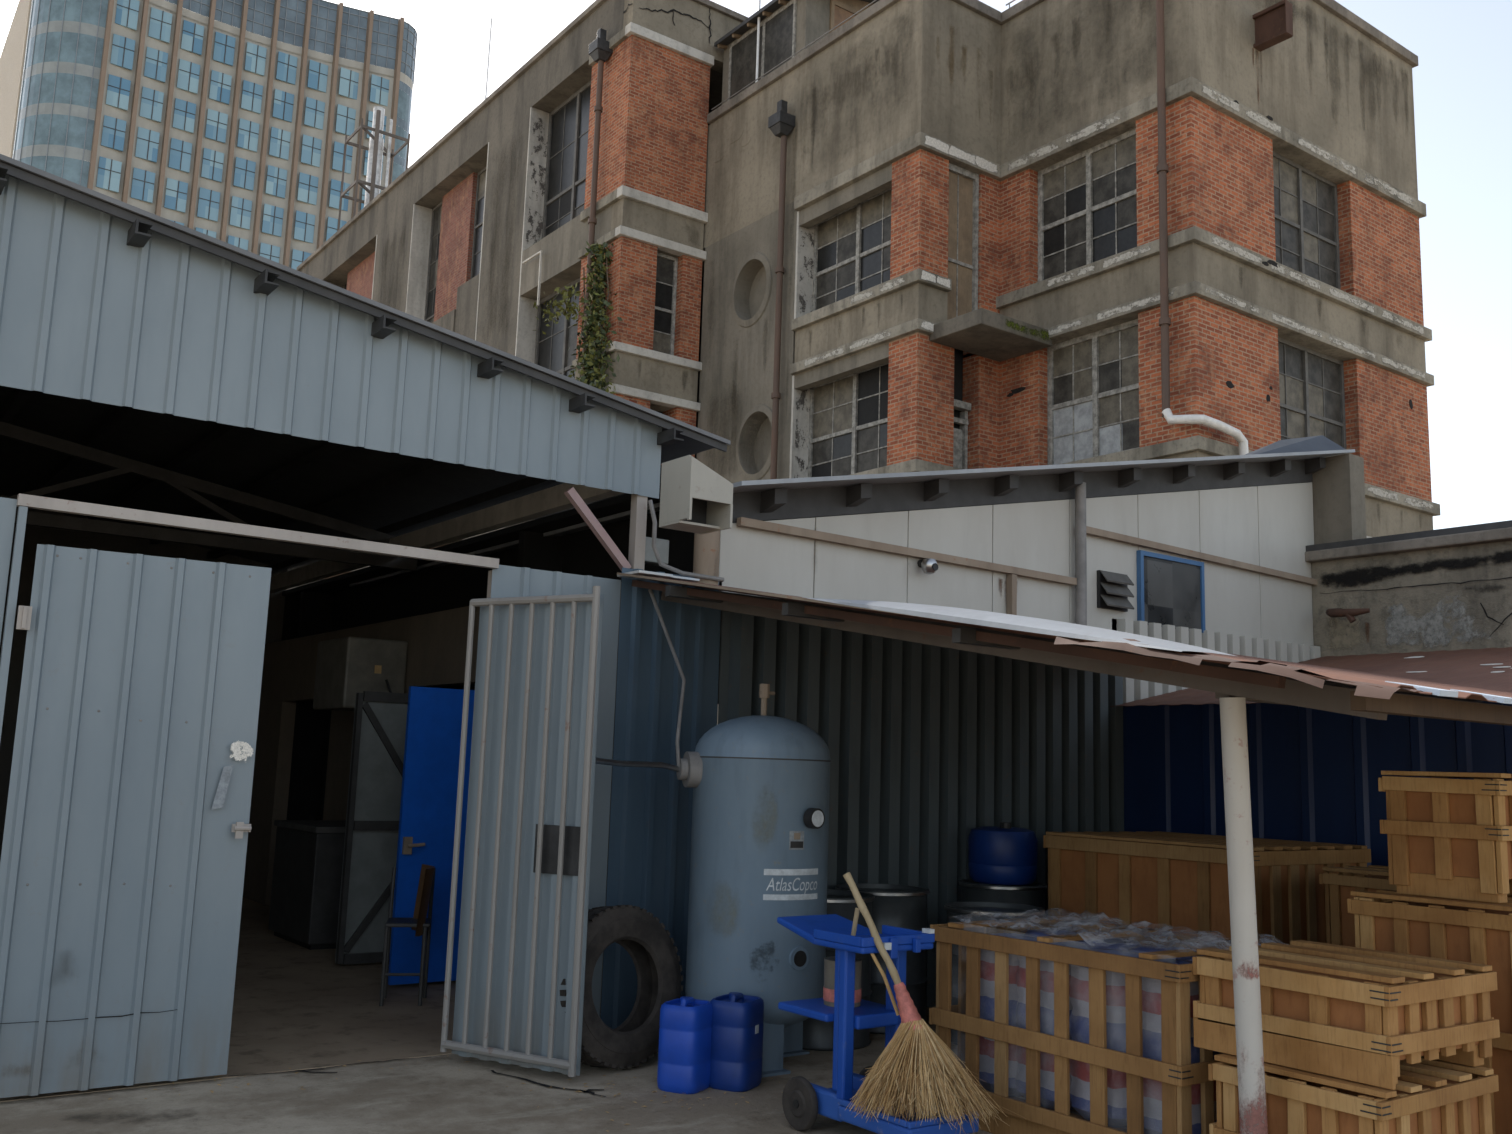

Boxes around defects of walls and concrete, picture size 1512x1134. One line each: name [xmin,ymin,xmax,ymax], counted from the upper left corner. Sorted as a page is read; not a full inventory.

crack [623,3,712,43]
peeling [526,118,548,244]
crack [1322,577,1512,637]
corrosion [1054,636,1423,699]